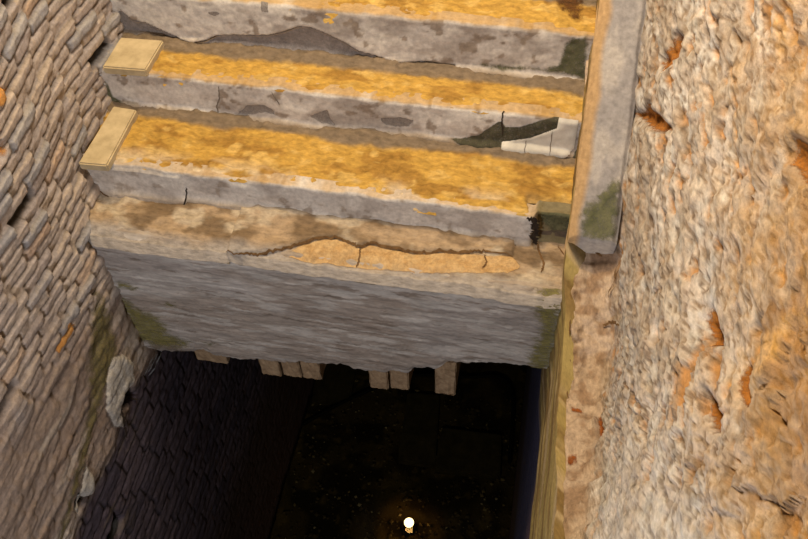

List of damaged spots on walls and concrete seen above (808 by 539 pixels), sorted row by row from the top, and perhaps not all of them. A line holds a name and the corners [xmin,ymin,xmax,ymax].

flaking render [119,11,177,38]
flaking render [185,26,377,58]
crack [226,235,513,257]
crack [527,216,564,272]